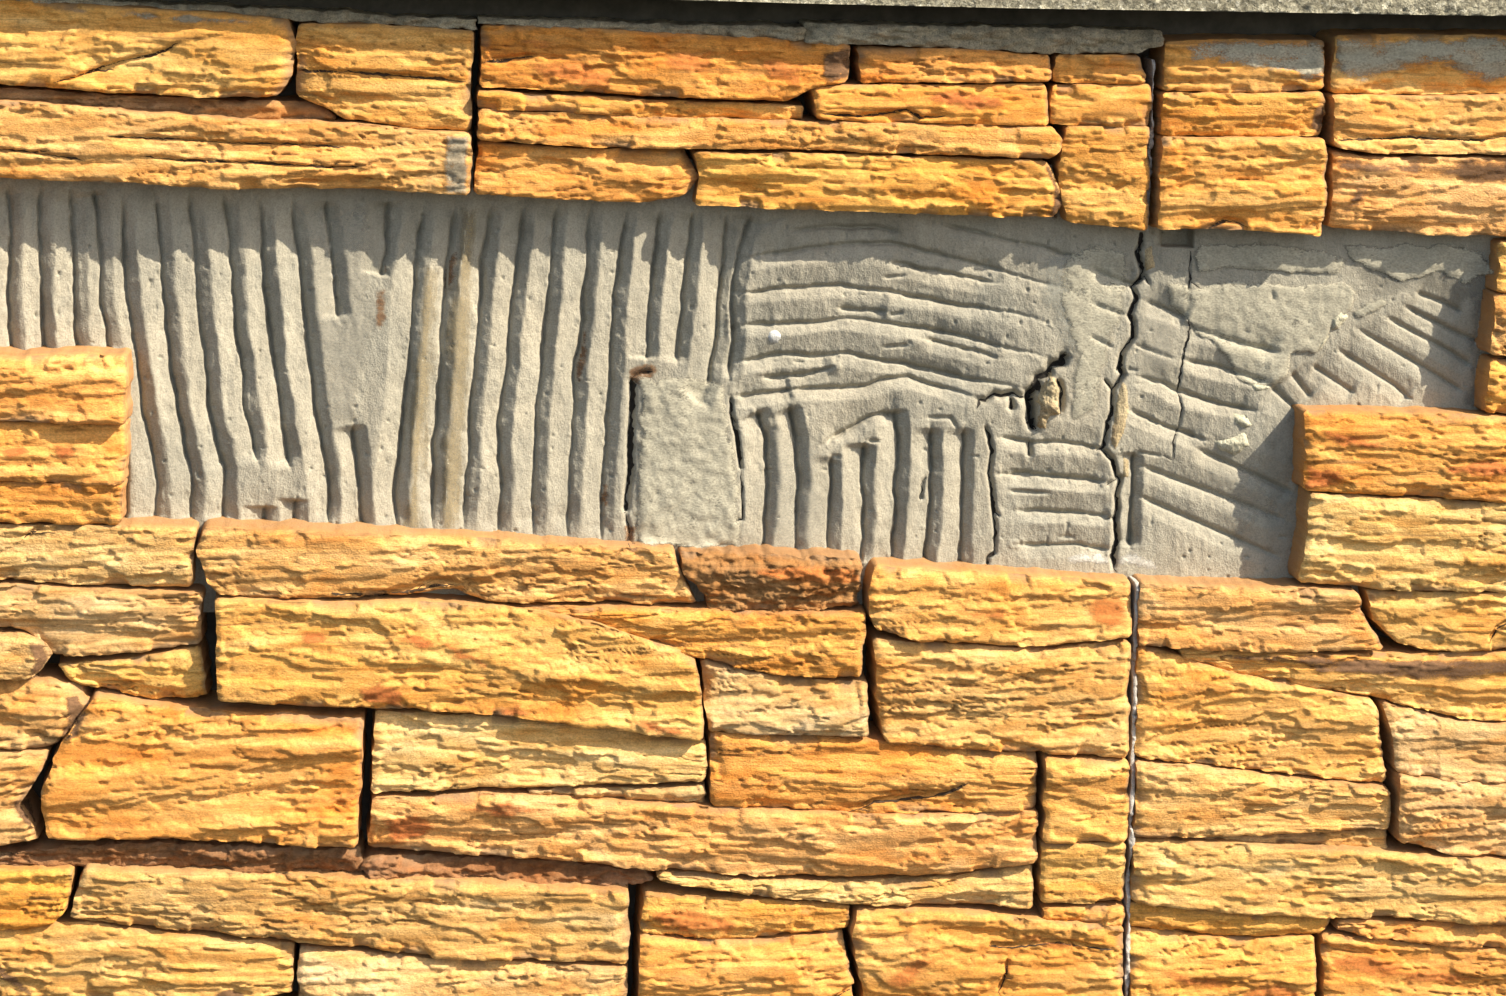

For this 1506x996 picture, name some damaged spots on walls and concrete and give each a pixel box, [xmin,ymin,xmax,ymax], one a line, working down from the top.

peeling [1195,243,1345,274]
crack [1163,220,1248,460]
spalling [1036,372,1062,429]
spalling [1110,383,1129,477]
crack [1096,232,1149,572]
peeling [1233,413,1252,428]